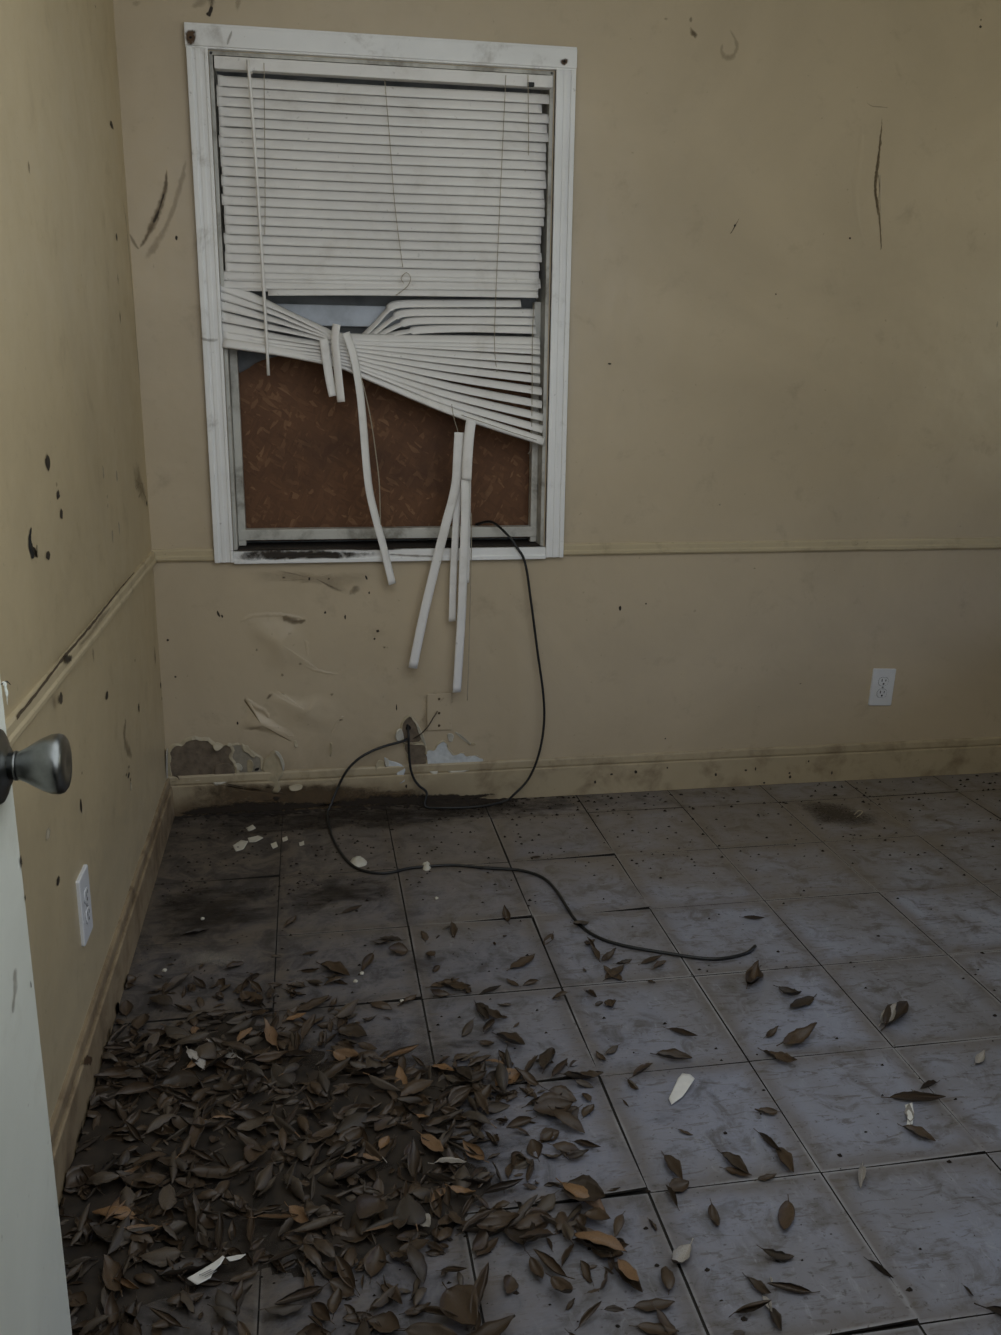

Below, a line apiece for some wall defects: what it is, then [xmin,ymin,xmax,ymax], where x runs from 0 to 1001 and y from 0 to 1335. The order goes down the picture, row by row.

flaking render [168,736,303,793]